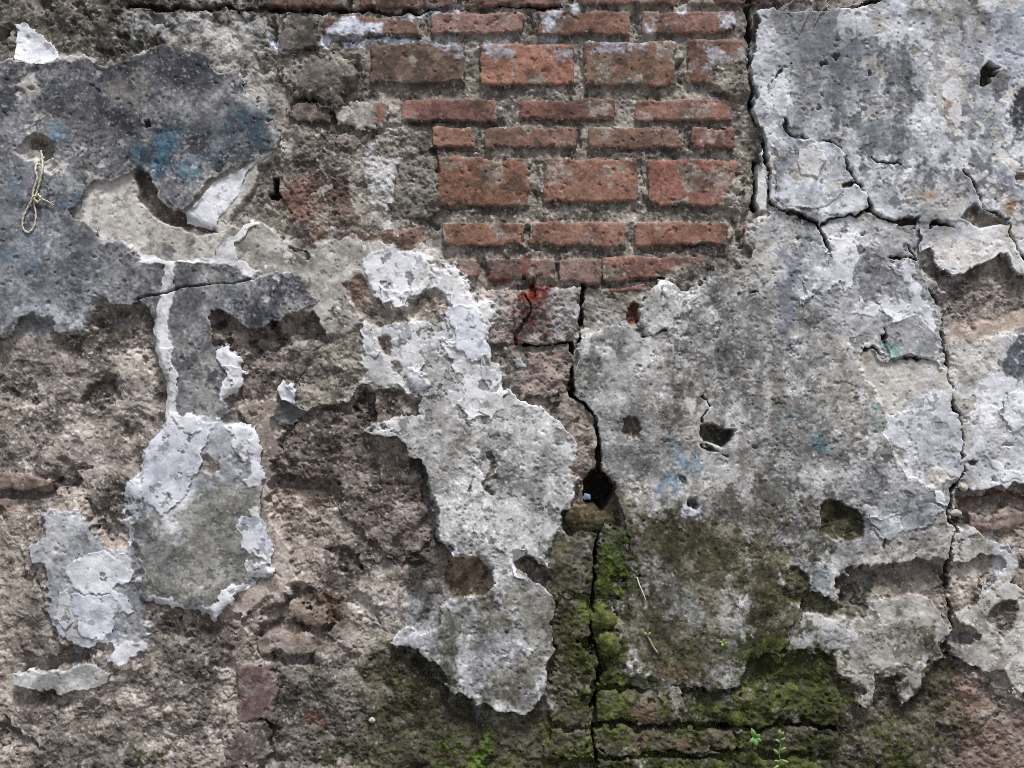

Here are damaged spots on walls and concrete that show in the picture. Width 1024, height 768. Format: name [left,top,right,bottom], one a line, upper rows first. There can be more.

crack [126,1,564,17]
crack [962,169,1024,259]
crack [134,278,252,302]
flaking render [0,0,770,768]
crack [516,284,602,473]
crack [642,328,670,339]
crack [737,291,762,299]
crack [743,0,967,629]
flaking render [648,553,1024,768]